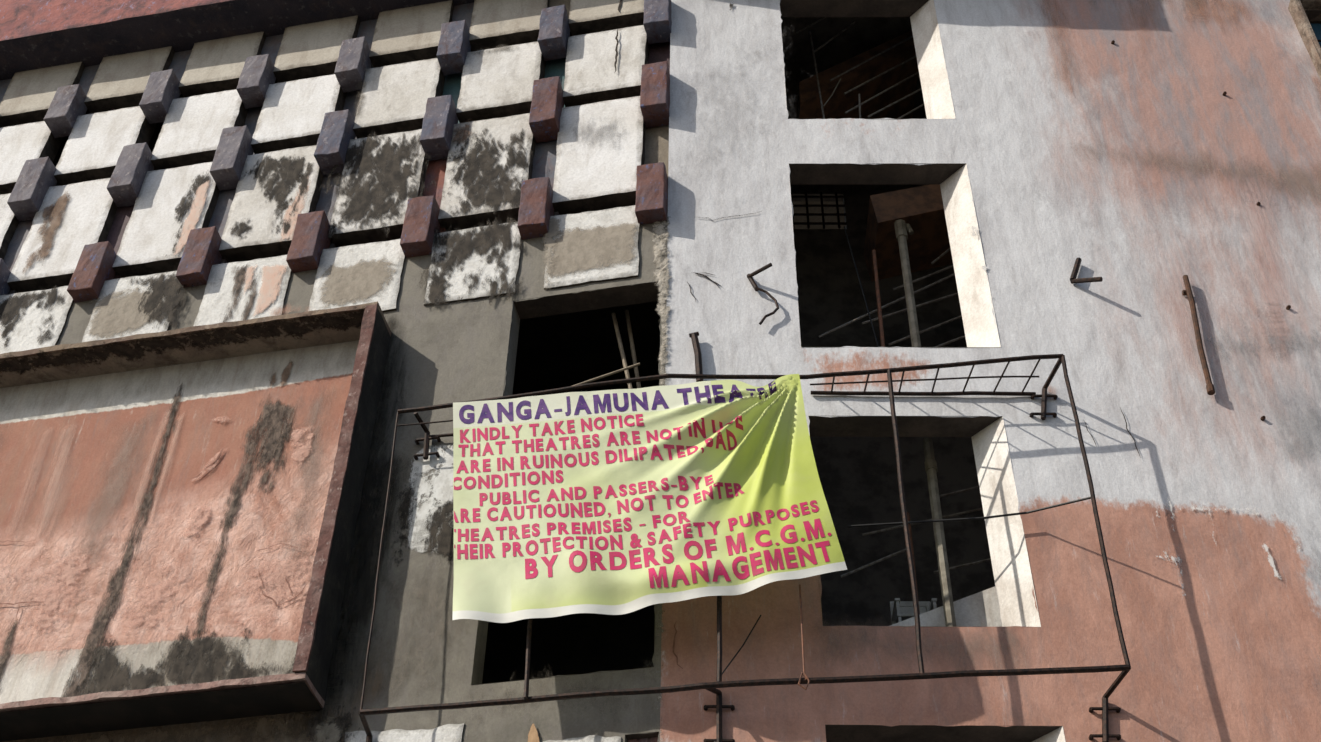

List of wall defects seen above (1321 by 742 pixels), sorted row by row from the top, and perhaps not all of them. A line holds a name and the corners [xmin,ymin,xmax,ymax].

peeling [175,182,209,254]
leakage [230,220,251,238]
leakage [244,132,433,239]
leakage [419,124,533,307]
leakage [0,265,365,377]
peeling [320,259,395,308]
leakage [27,320,454,742]
peeling [406,445,453,553]
leakage [0,619,18,679]